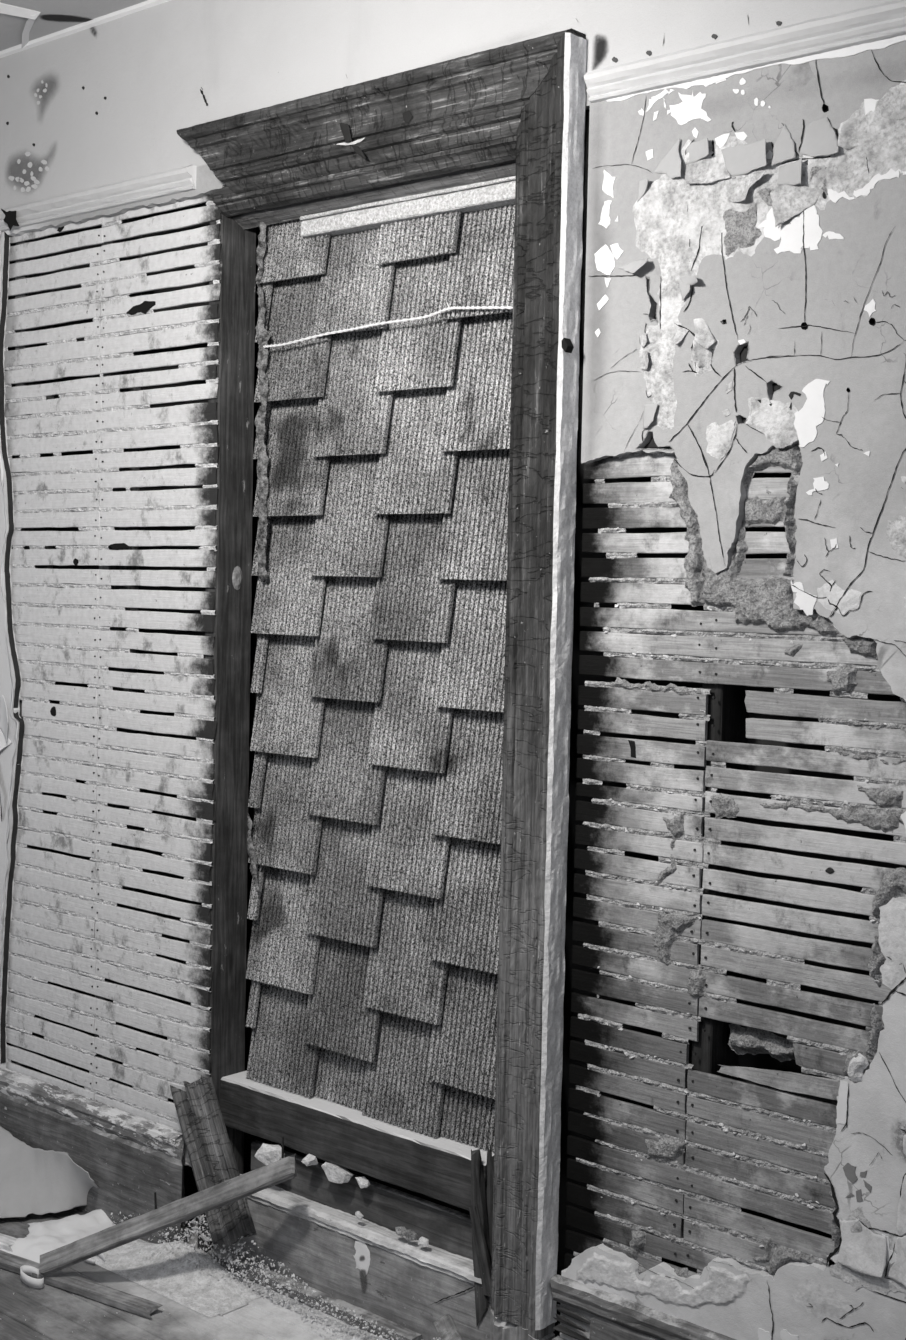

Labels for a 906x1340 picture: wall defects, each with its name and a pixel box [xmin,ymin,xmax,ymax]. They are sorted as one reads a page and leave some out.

damp [34,80,55,105]
damp [8,152,49,193]
spalling [132,203,210,257]
spalling [142,265,209,313]
crack [590,62,906,618]
spalling [141,343,208,408]
spalling [139,526,200,550]
peeling [557,35,906,1275]
crack [881,957,906,1004]
crack [841,1052,906,1197]
crack [807,1173,906,1332]
crack [766,1283,774,1336]